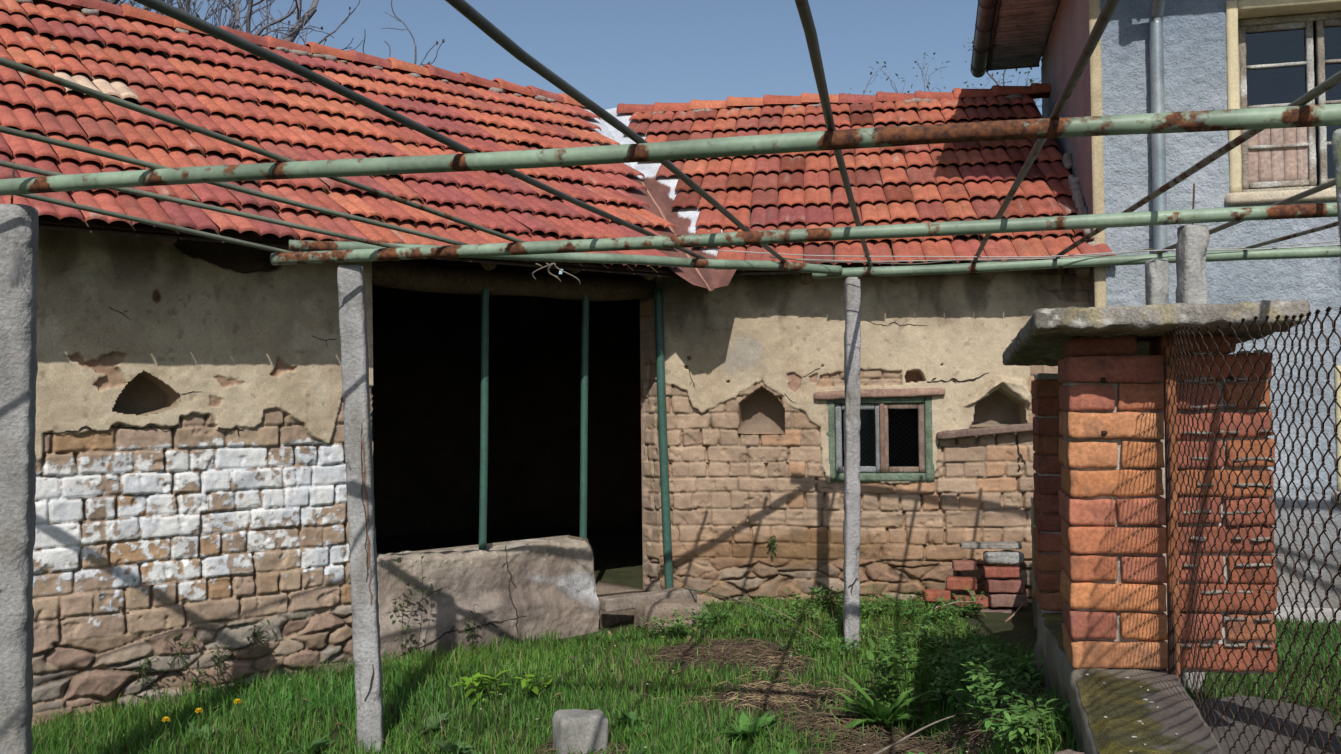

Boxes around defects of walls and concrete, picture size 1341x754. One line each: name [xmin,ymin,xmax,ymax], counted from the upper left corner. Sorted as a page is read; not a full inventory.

flaking render [67,351,128,390]
flaking render [209,376,245,407]
flaking render [270,356,298,378]
flaking render [786,365,925,394]
crack [364,546,527,701]